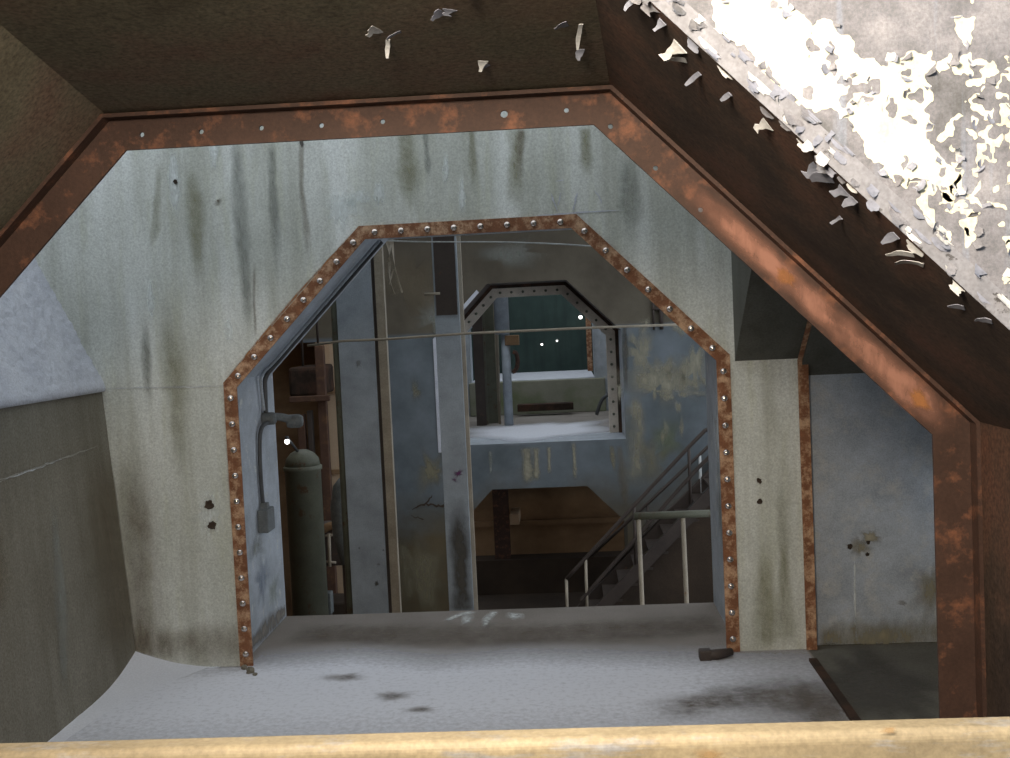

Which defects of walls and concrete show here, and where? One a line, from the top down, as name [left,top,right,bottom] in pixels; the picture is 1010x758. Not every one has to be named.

peeling [365,25,401,58]
peeling [431,8,458,21]
peeling [554,21,585,61]
peeling [623,0,1010,310]
rust [234,237,349,370]
peeling [631,338,705,411]
crack [0,447,95,482]
rust [452,519,470,609]